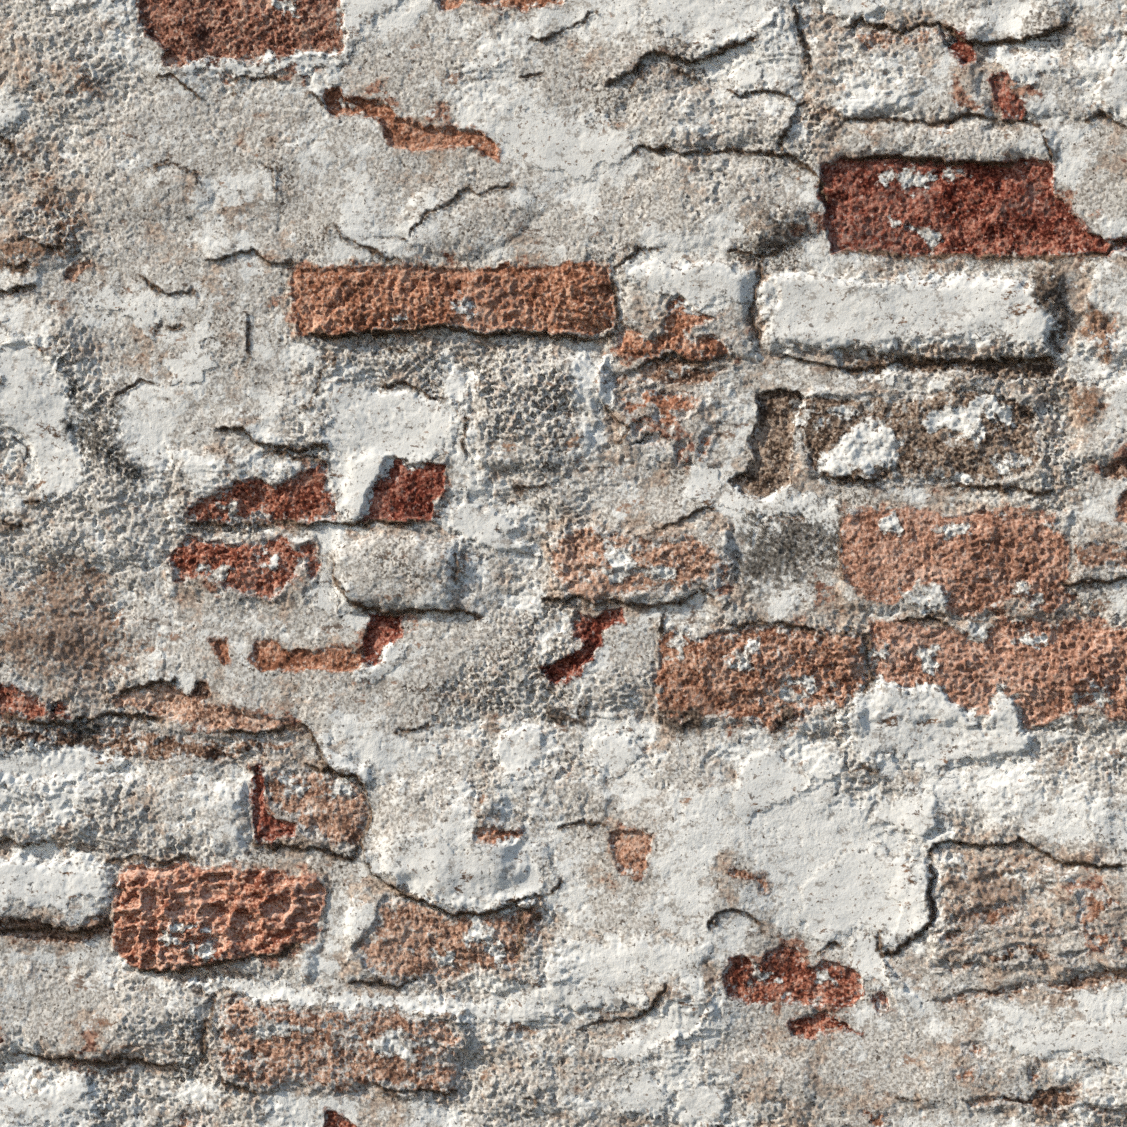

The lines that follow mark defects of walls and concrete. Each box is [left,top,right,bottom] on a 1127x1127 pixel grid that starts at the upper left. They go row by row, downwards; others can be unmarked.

spalling [135,0,636,182]
crack [603,36,759,92]
crack [631,5,1014,205]
crack [838,110,1053,163]
crack [839,18,1073,47]
peeling [0,314,90,508]
peeling [165,369,736,686]
spalling [288,151,1127,1041]
spalling [0,679,383,853]
spalling [0,819,740,1127]
crack [218,721,563,959]
crack [873,836,1127,958]